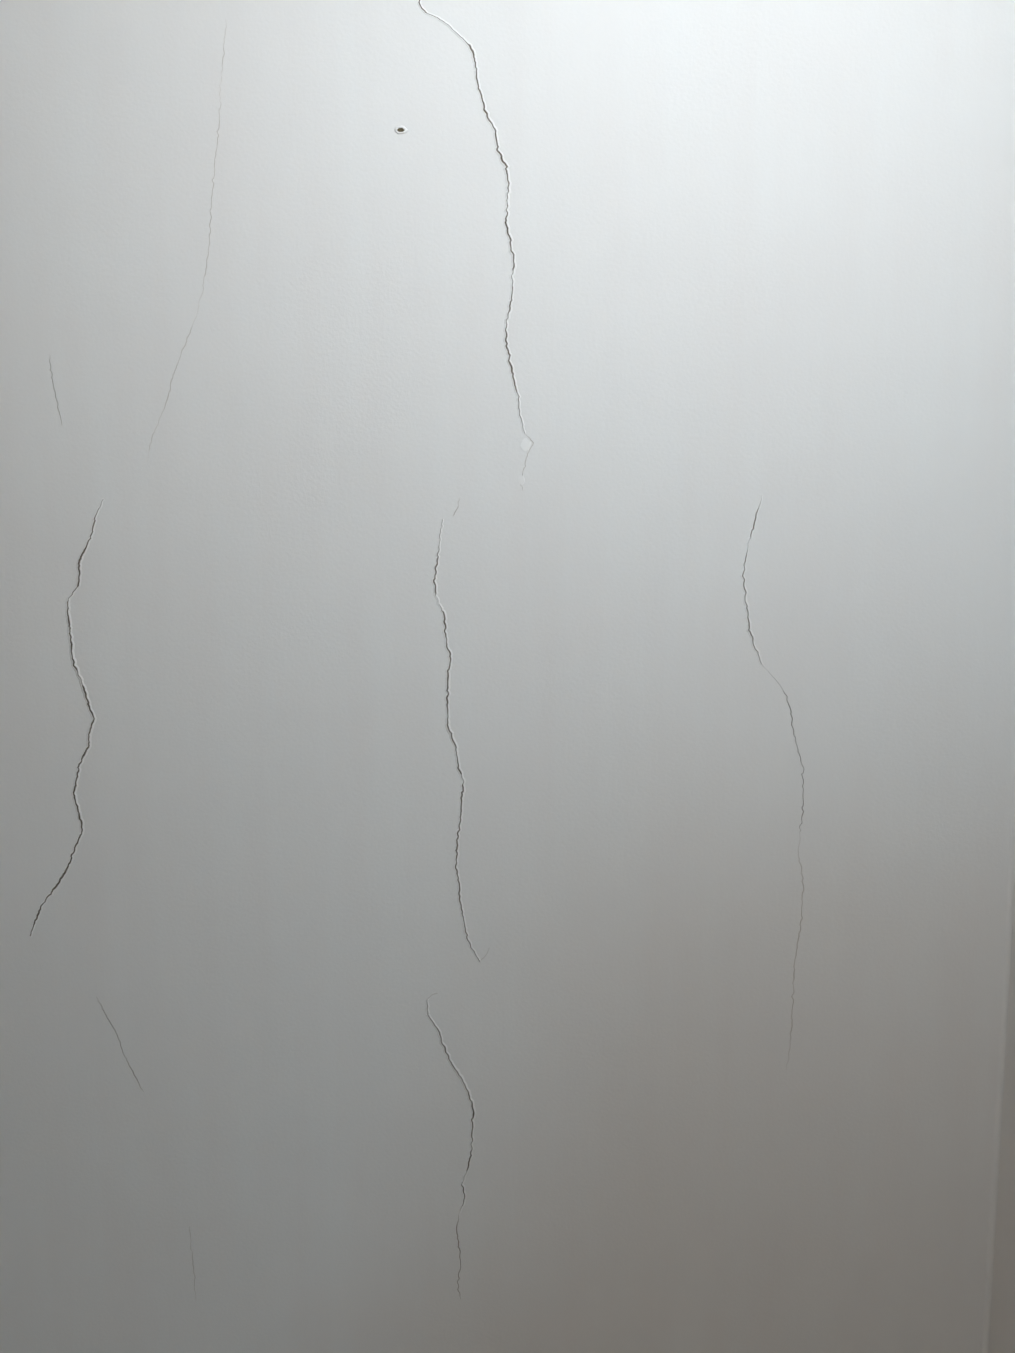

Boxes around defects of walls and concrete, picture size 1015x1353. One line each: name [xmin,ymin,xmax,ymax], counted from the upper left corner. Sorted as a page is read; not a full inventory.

crack [417,0,534,491]
crack [29,498,104,937]
crack [431,501,489,962]
crack [740,496,804,1065]
crack [425,993,476,1299]